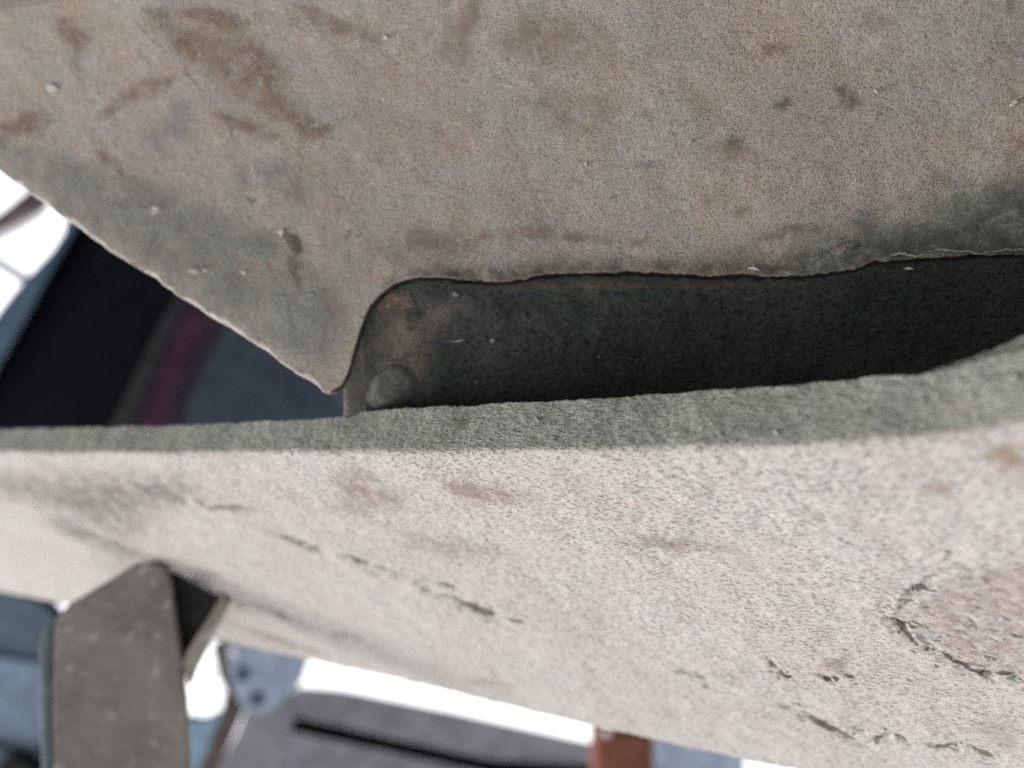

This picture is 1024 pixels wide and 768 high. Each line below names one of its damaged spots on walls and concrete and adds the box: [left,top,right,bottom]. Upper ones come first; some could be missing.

crack [881,583,1024,683]
crack [769,658,908,745]
crack [934,742,1000,757]